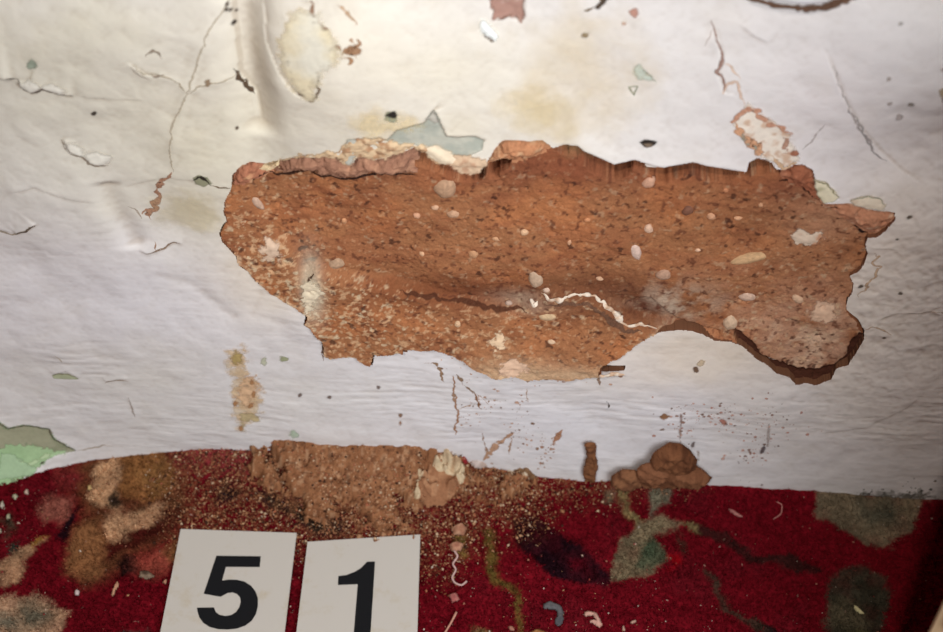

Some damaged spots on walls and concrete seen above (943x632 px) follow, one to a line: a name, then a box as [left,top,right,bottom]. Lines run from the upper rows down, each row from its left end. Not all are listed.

crack [12,60,67,96]
crack [131,0,255,173]
peeling [277,1,362,103]
flaking render [478,0,525,42]
crack [705,20,745,106]
spalling [193,104,895,382]
peeling [0,423,113,534]